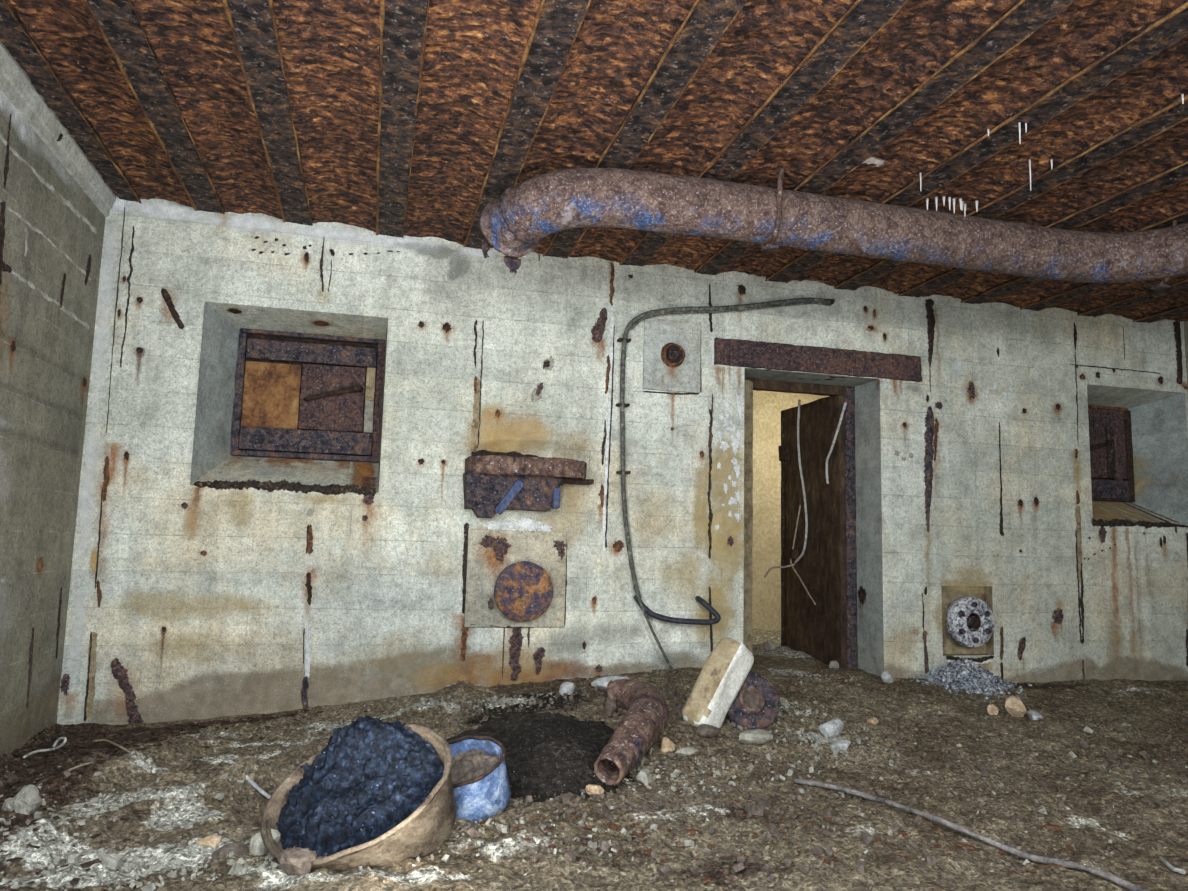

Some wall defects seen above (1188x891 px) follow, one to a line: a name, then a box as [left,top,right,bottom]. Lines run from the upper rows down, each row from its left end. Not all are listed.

rust [591,308,607,348]
rust [101,443,129,502]
rust [91,551,102,608]
rust [480,534,511,566]
water stain [694,444,744,643]
rust [1092,461,1179,610]
water stain [91,616,464,725]
rust [424,628,602,687]